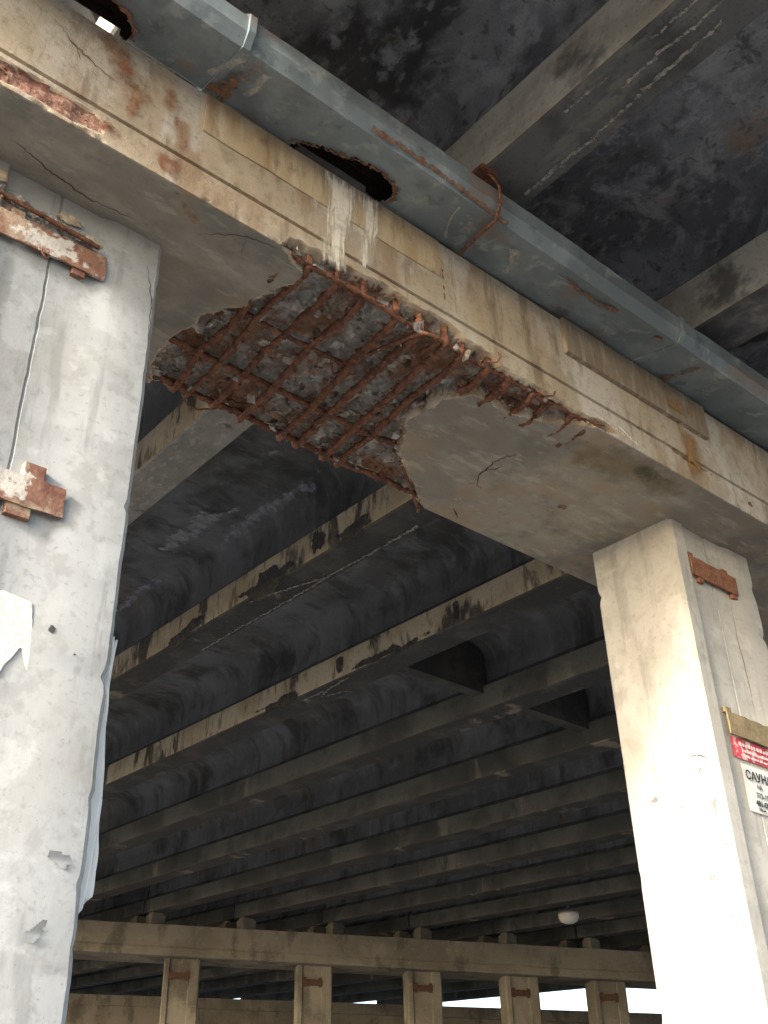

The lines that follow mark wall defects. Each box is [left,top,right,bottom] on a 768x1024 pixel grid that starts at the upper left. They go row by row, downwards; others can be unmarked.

crack [56,22,123,86]
rust [107,0,148,114]
crack [11,139,130,217]
rust [371,126,508,225]
leakage [314,170,378,268]
spalling [147,236,621,513]
crack [468,454,516,488]
peeling [0,590,32,671]
peeling [48,850,72,869]